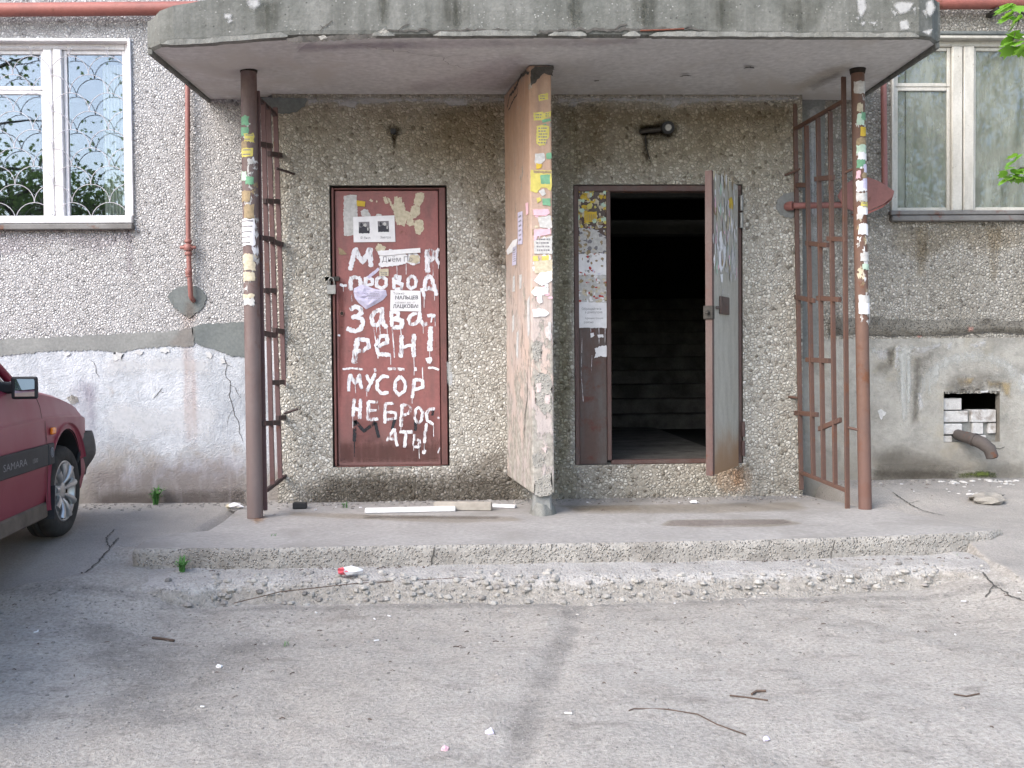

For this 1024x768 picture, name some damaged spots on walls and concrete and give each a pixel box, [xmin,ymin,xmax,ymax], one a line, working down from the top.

crack [224,357,243,441]
peeling [531,326,553,415]
damp [900,344,975,419]
spalling [532,447,552,497]